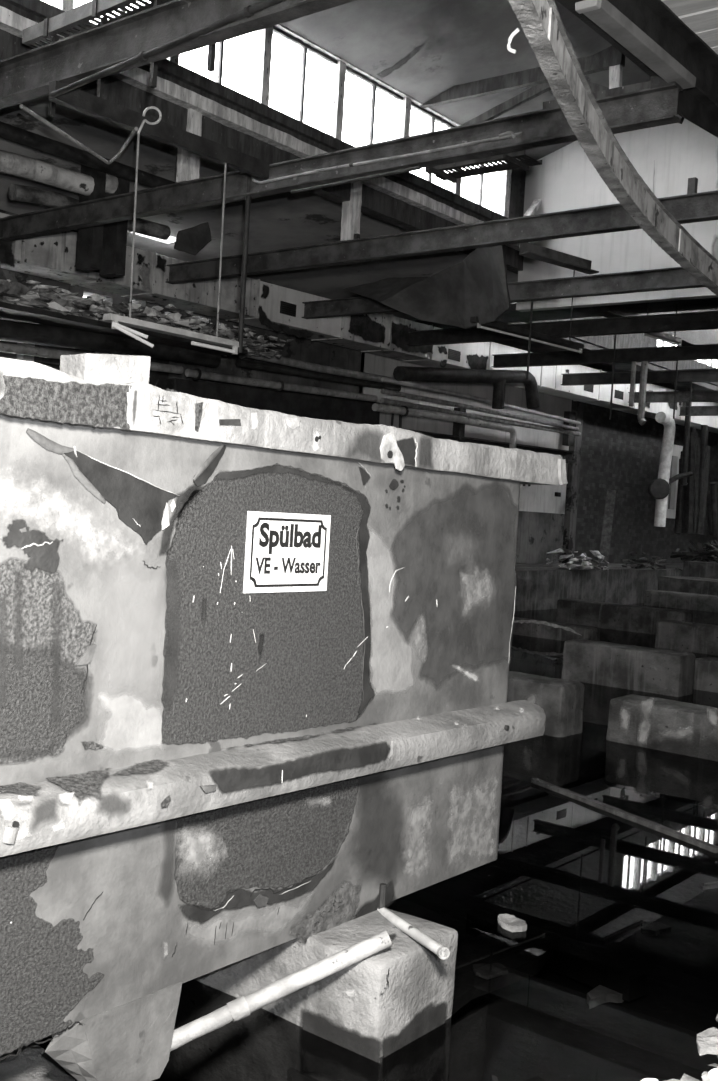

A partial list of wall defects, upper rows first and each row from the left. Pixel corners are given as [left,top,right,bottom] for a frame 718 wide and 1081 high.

peeling [0,558,97,764]
peeling [161,462,375,745]
leakage [392,448,582,687]
peeling [0,797,32,840]
peeling [0,844,104,1056]
peeling [174,776,360,924]